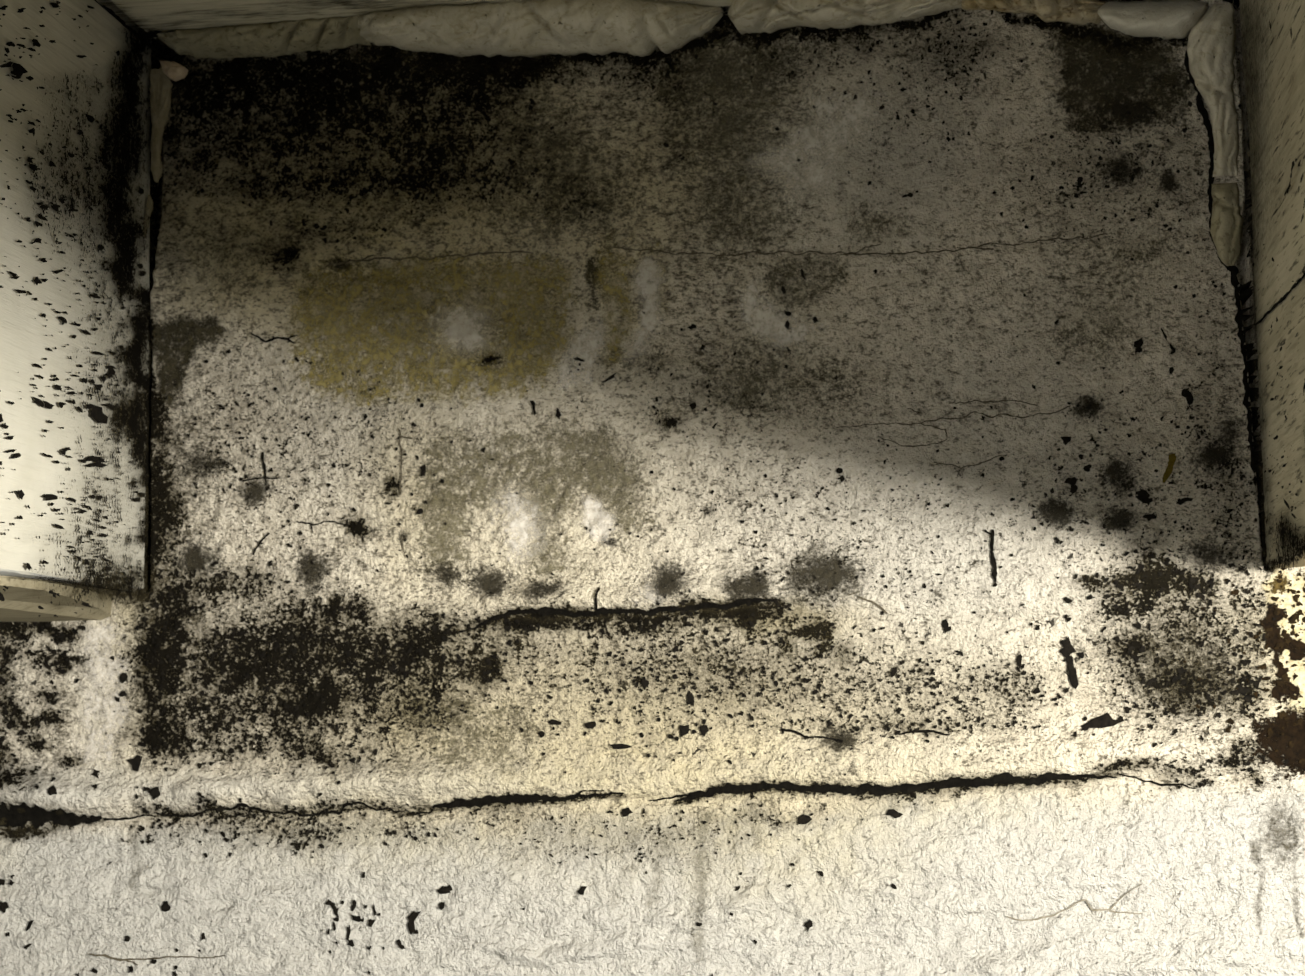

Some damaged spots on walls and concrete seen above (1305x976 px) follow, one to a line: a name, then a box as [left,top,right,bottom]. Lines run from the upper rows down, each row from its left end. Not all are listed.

leakage [0,6,1210,793]
leakage [987,266,1305,793]
crack [458,588,781,633]
peeling [1201,551,1305,765]
corrosion [1248,704,1305,781]
leakage [115,782,440,858]
crack [0,769,1196,840]
leakage [455,797,843,874]
leakage [1252,810,1296,859]